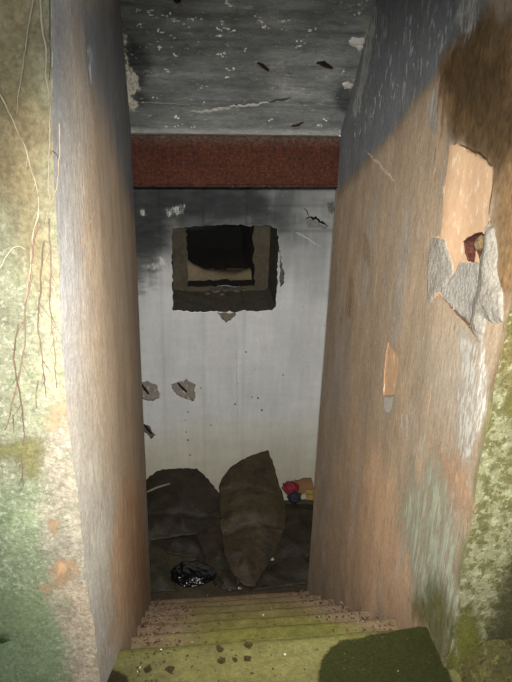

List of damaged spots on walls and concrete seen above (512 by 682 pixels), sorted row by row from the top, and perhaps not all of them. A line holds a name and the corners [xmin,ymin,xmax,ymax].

peeling [123,33,140,111]
crack [304,208,328,229]
spalling [427,143,504,343]
spalling [142,381,160,401]
spalling [171,379,201,401]
spalling [384,343,399,395]